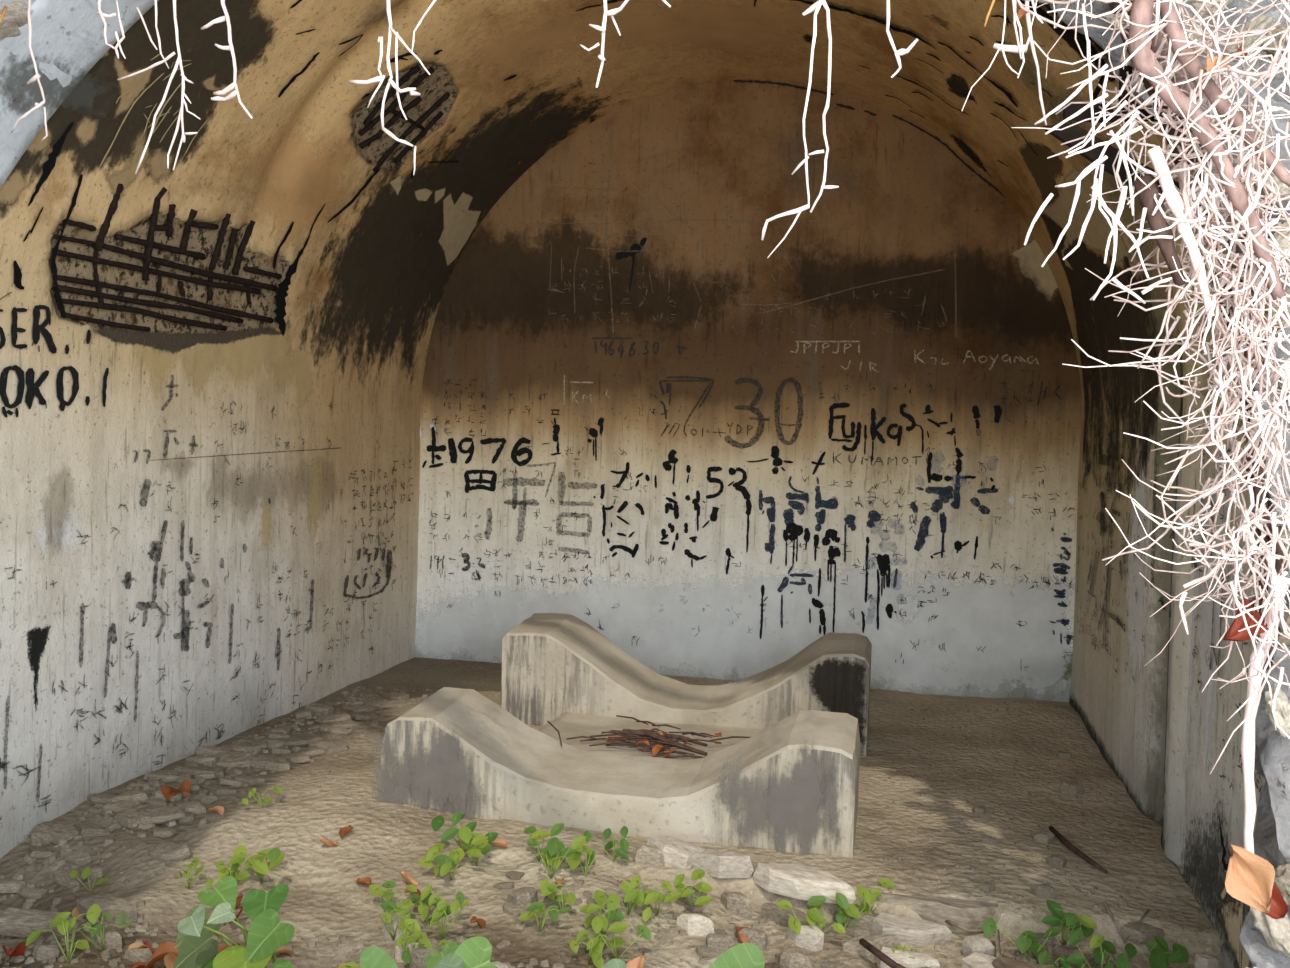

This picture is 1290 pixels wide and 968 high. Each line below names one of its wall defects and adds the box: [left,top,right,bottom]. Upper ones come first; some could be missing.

spalling [1020,0,1133,104]
spalling [352,63,481,266]
spalling [50,132,290,354]
peeling [1012,142,1130,301]
damp [1124,257,1152,325]
crack [1218,815,1230,871]
flaking render [1221,888,1250,968]